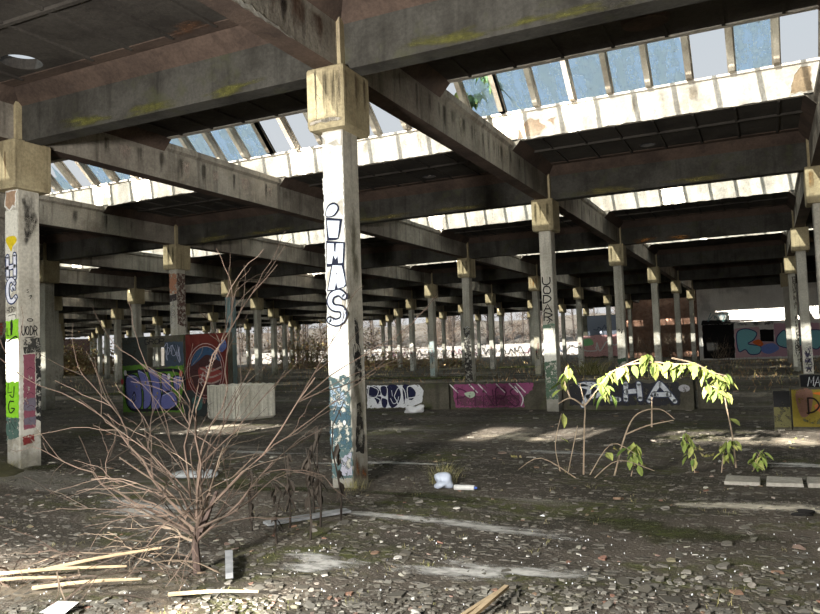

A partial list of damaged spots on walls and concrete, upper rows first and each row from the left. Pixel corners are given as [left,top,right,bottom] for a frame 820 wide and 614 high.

leakage [22,199,37,242]